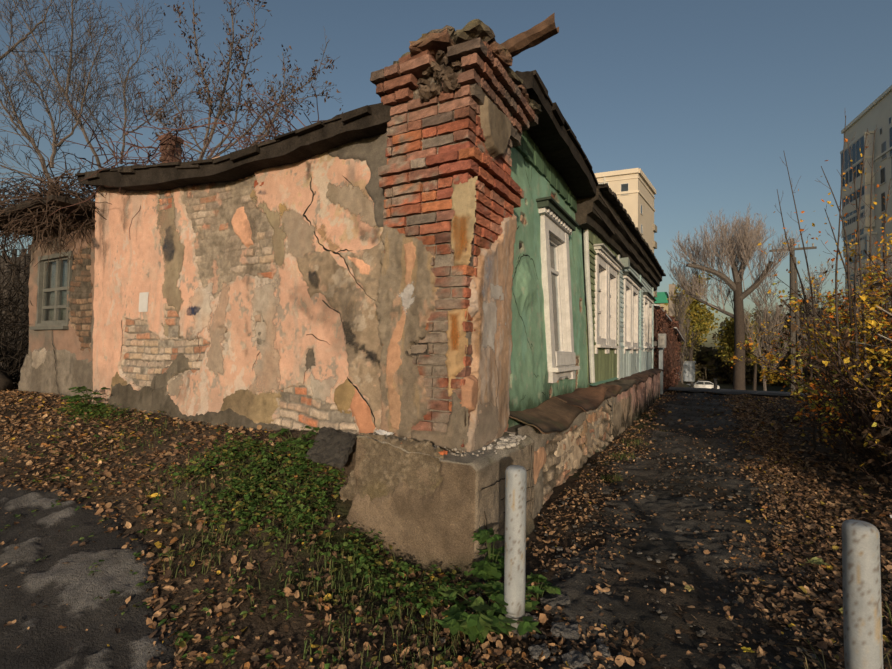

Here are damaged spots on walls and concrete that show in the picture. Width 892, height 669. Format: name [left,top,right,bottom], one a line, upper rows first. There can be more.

crack [307,300,351,347]
flaking render [120,19,542,502]
crack [303,177,376,301]
crack [512,252,538,350]